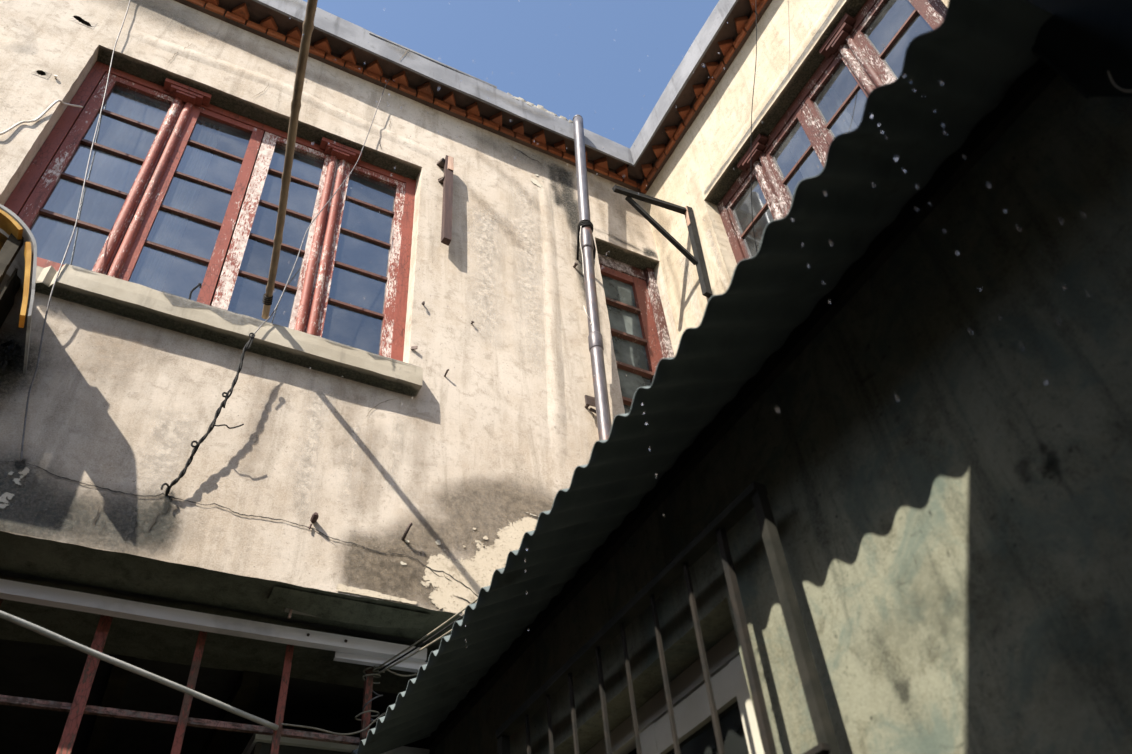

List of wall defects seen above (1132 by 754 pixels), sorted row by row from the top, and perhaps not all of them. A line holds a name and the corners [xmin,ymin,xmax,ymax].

flaking render [0,459,30,509]
water stain [0,459,174,551]
crack [0,461,478,604]
flaking render [336,517,537,614]
water stain [345,482,554,603]